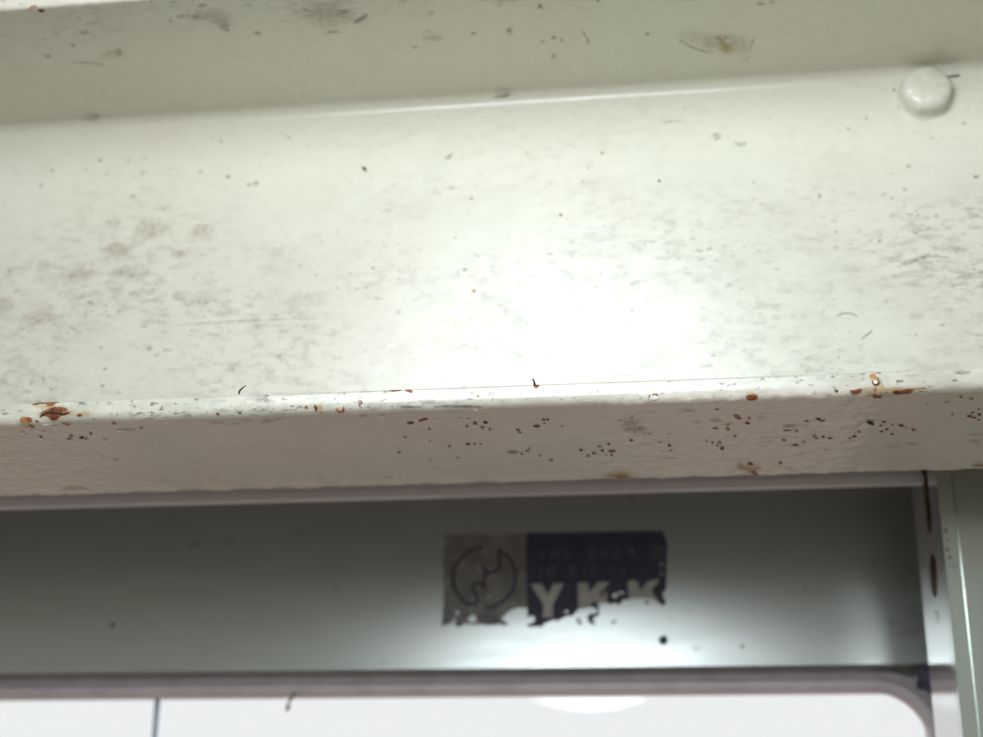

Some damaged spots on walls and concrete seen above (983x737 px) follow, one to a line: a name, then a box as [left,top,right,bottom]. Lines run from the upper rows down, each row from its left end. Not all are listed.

corrosion [850,374,925,398]
corrosion [20,402,86,428]